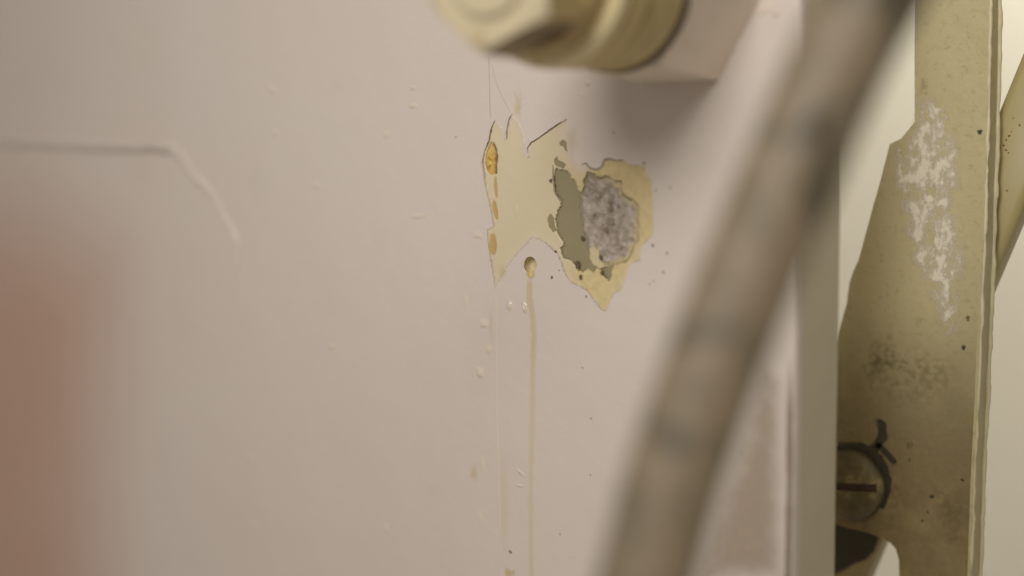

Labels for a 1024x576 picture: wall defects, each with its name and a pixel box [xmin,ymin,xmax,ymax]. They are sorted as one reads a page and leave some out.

rust [486,142,498,219]
peeling [480,113,657,312]